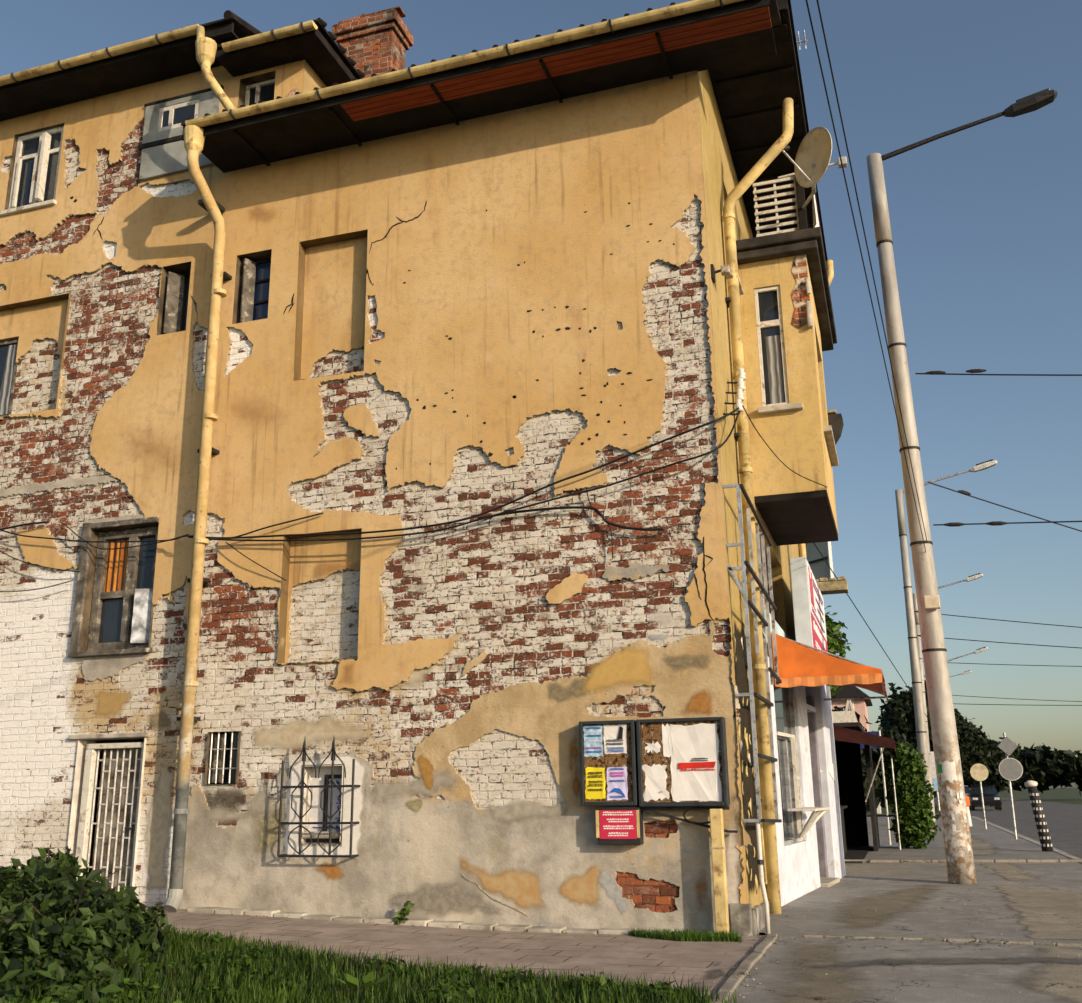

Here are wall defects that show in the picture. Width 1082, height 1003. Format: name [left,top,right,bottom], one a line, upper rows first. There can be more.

flaking render [0,117,197,264]
crack [366,201,427,284]
flaking render [791,255,813,329]
flaking render [0,194,743,913]
peeling [729,677,756,818]
damp [205,789,245,813]
damp [255,716,454,858]
damp [490,802,566,822]
damp [391,884,500,915]
damp [598,871,627,912]
peeling [746,845,758,894]